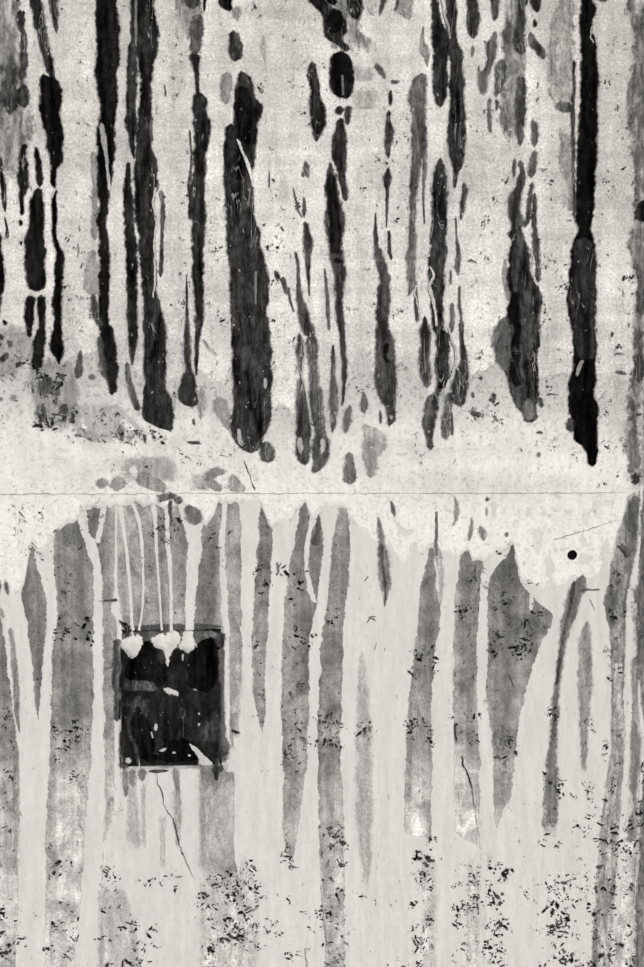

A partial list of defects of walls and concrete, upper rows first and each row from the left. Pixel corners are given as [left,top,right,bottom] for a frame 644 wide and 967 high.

damp [20,147,47,291]
damp [39,74,64,188]
damp [123,163,138,365]
damp [124,41,138,158]
damp [332,118,349,201]
damp [307,0,399,157]
damp [405,73,432,386]
damp [428,158,451,390]
damp [420,0,466,187]
damp [508,160,541,285]
damp [125,630,220,696]
crack [157,781,193,876]